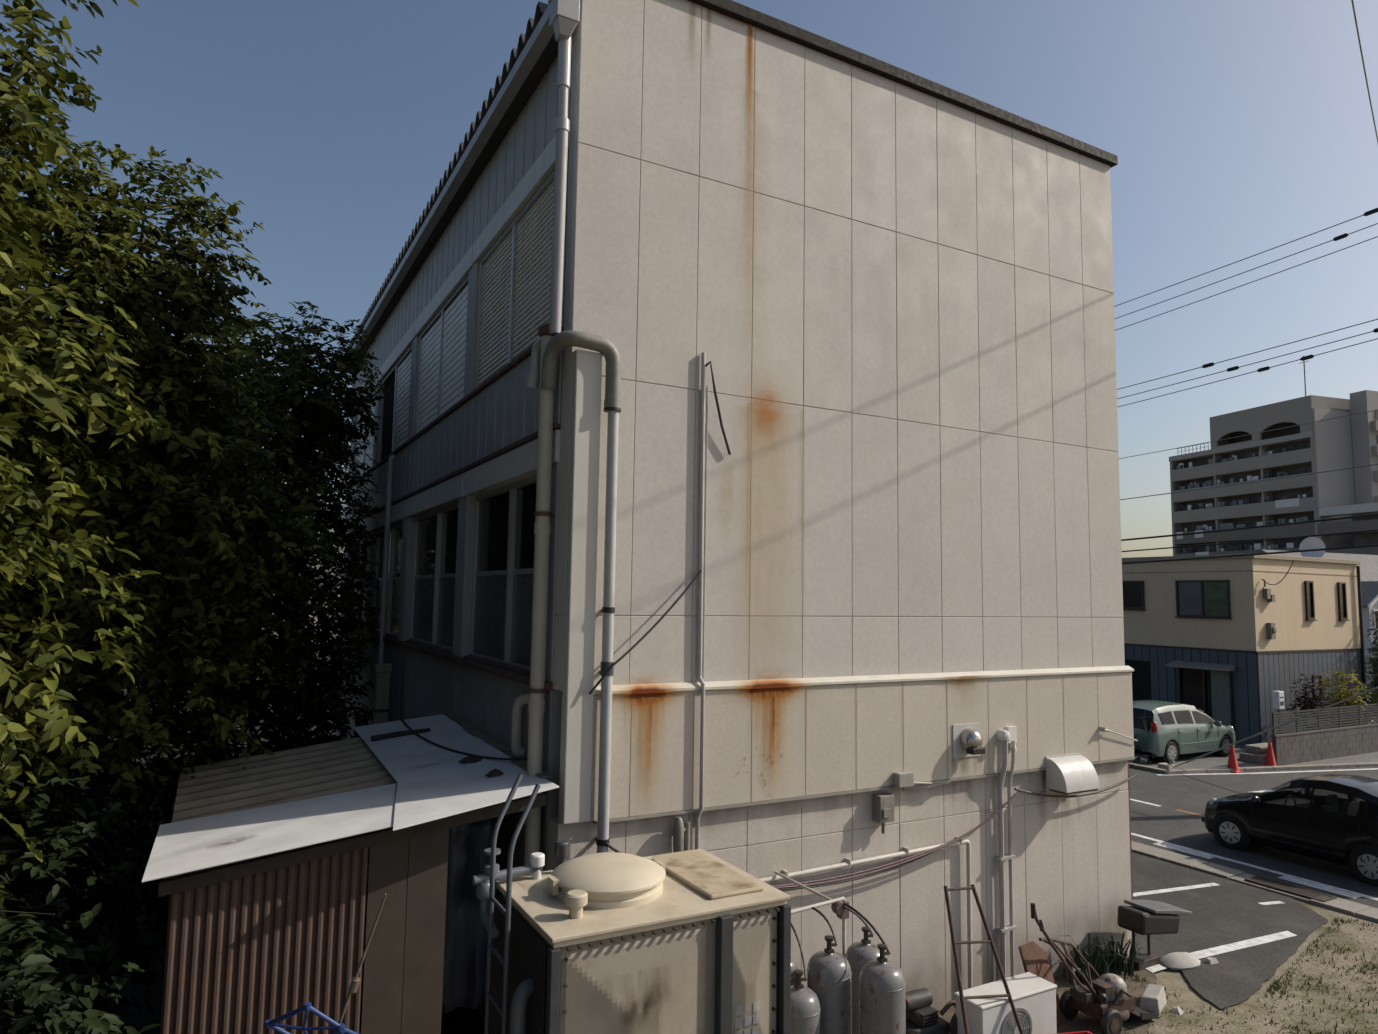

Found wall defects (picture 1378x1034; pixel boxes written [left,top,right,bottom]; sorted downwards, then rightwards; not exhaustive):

rust [623,685,672,764]
rust [741,680,801,753]